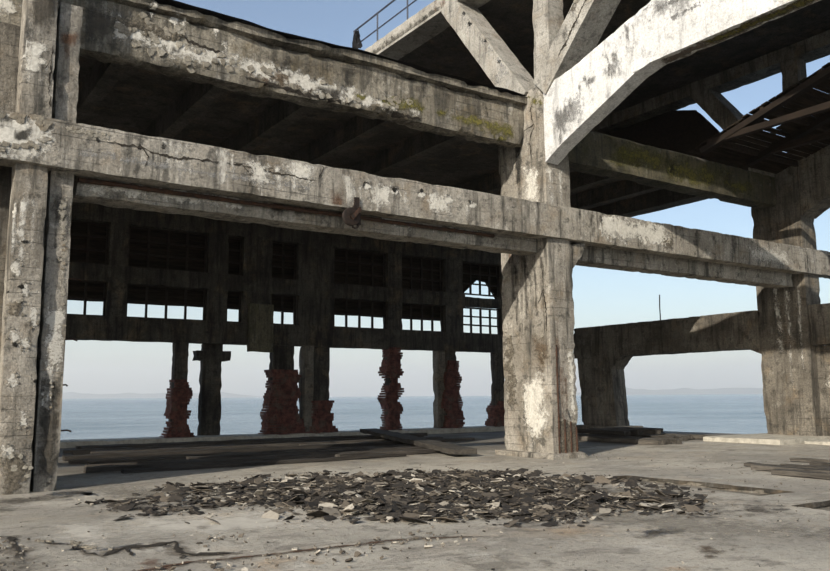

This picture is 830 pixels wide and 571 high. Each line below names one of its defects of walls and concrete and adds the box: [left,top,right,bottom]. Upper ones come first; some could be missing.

peeling [113,11,420,117]
peeling [0,111,56,161]
crack [100,140,327,186]
spalling [533,333,579,454]
crack [0,533,491,571]